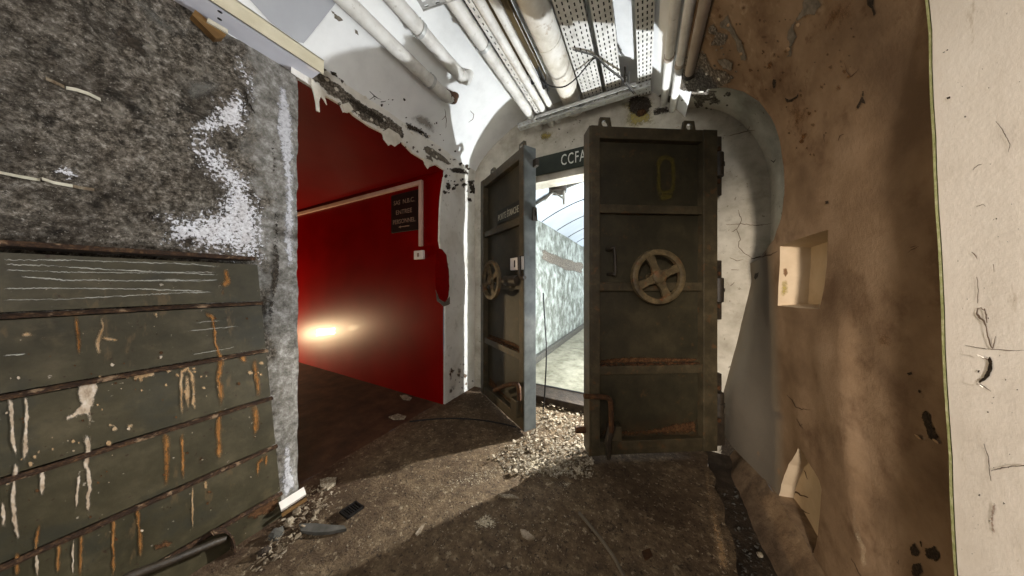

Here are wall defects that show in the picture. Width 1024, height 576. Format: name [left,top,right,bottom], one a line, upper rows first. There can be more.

spalling [310,68,475,202]
damp [153,56,295,316]
crack [726,210,777,286]
crack [965,252,1021,351]
corrosion [165,367,205,418]
corrosion [197,314,223,399]
corrosion [238,356,263,391]
spalling [914,411,939,444]
corrosion [163,435,202,481]
damp [283,447,294,496]
corrosion [136,510,172,554]